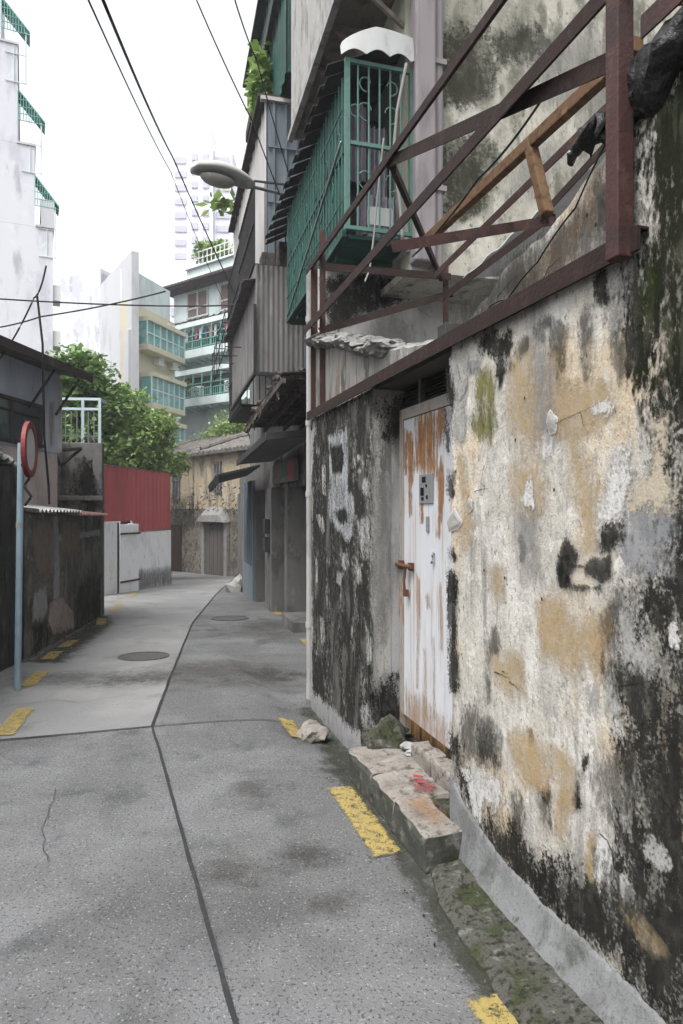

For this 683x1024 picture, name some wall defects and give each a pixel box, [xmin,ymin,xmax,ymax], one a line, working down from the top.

damp [443,20,551,111]
damp [311,388,404,736]
rust [404,407,446,539]
damp [443,66,683,1024]